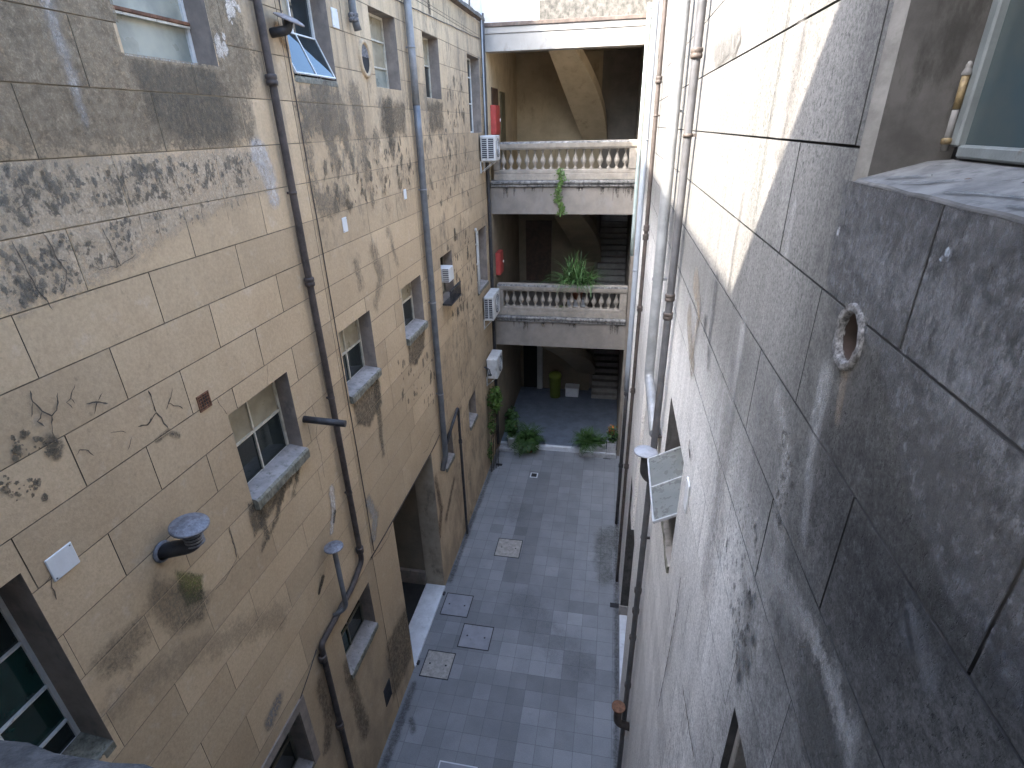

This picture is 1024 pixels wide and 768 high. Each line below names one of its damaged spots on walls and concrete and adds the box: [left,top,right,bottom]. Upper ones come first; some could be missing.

water stain [298,81,414,222]
crack [11,185,67,310]
crack [92,228,135,270]
water stain [11,429,63,461]
crack [30,386,182,456]
water stain [354,379,384,454]
water stain [0,475,48,501]
water stain [248,467,301,548]